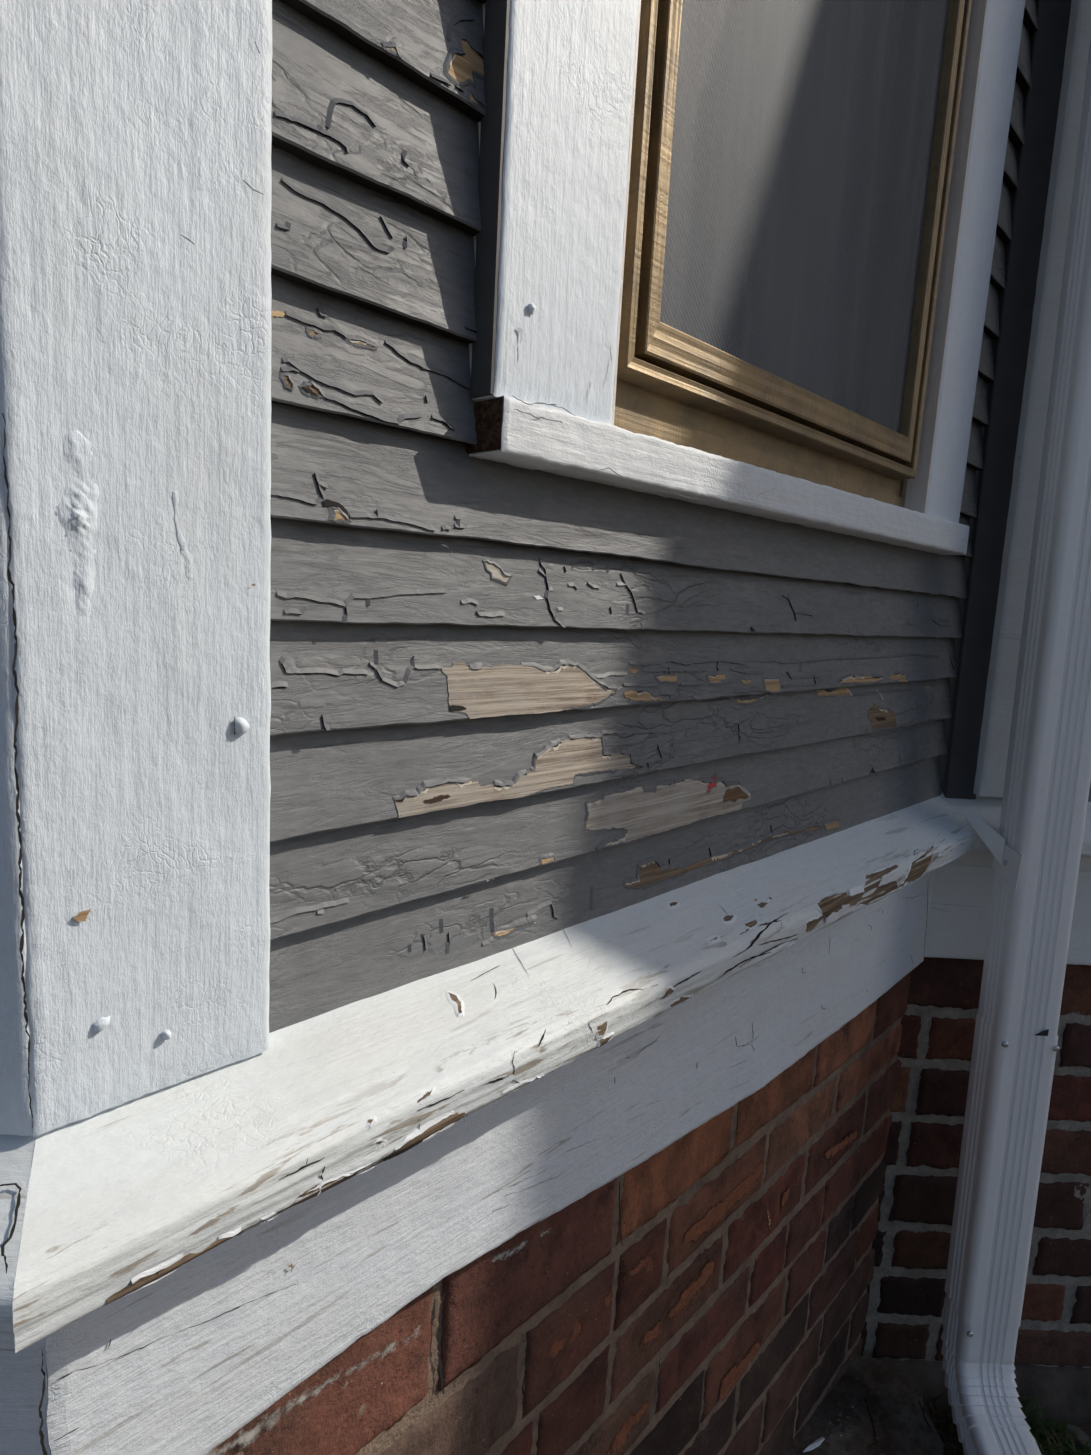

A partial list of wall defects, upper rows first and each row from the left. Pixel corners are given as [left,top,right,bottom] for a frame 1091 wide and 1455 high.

peeling [443,35,487,109]
crack [274,98,377,153]
crack [280,340,471,431]
crack [539,557,645,627]
peeling [441,659,679,719]
crack [2,413,33,1129]
peeling [392,732,751,850]
peeling [707,897,772,943]
peeling [803,842,936,934]
crack [0,1183,22,1274]
peeling [103,1087,468,1307]
crack [39,1284,296,1455]